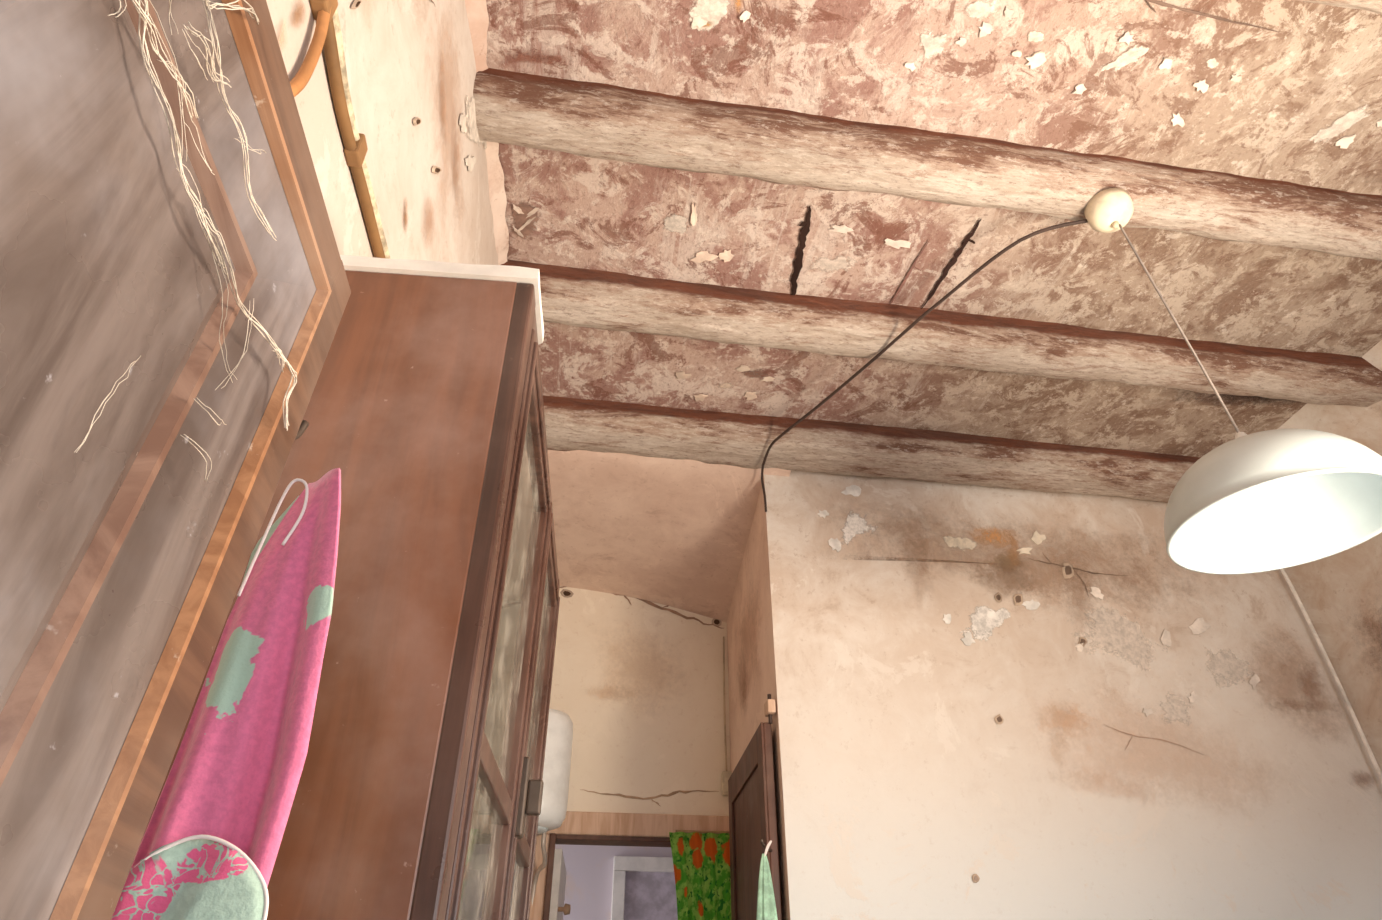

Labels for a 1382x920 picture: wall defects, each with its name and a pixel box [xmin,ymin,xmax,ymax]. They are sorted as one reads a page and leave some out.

crack [791,206,811,295]
crack [890,219,981,309]
peeling [828,485,877,552]
peeling [942,592,1040,646]
crack [582,789,719,806]